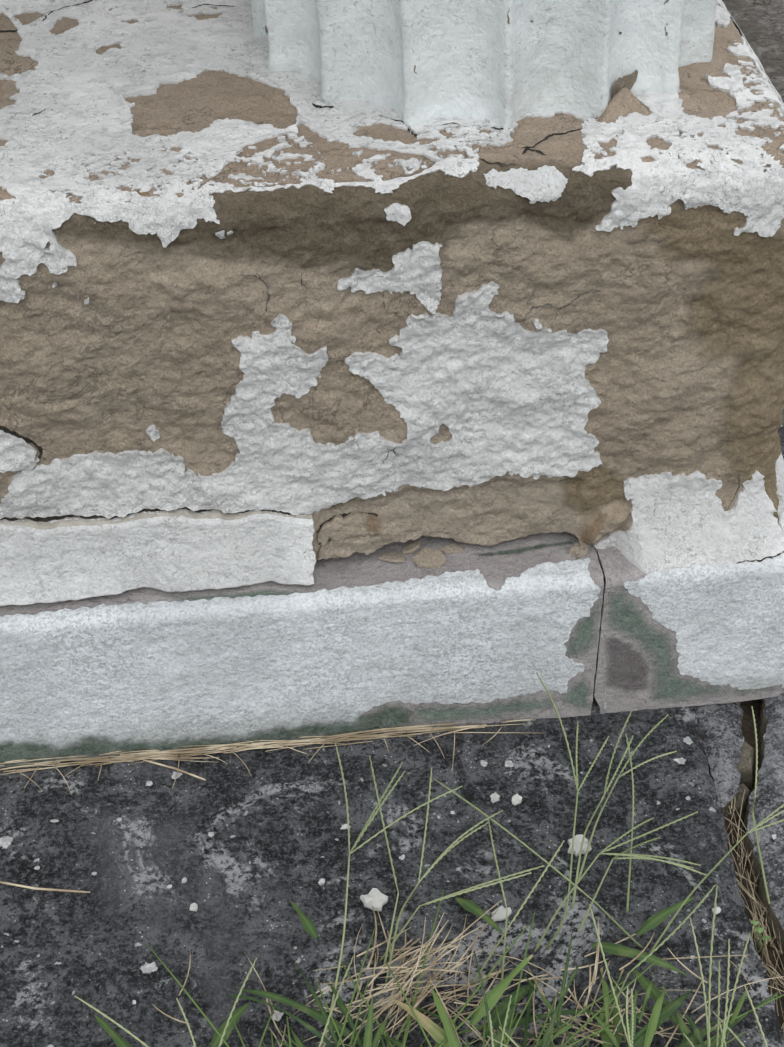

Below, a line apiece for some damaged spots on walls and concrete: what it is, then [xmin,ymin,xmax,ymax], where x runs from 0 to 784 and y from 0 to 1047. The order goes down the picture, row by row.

peeling [50,17,79,35]
peeling [166,3,222,20]
peeling [0,13,44,109]
peeling [96,44,122,54]
peeling [678,18,784,172]
peeling [0,70,784,734]
crack [0,426,43,463]
crack [0,507,378,545]
damp [608,639,647,690]